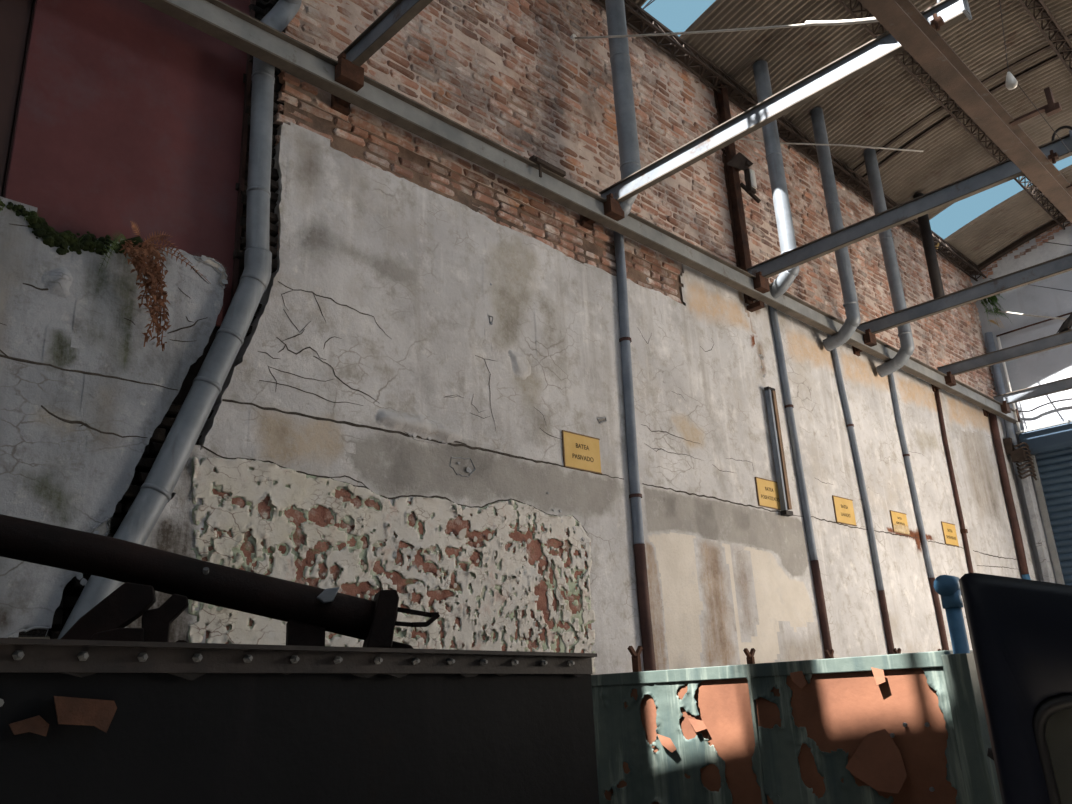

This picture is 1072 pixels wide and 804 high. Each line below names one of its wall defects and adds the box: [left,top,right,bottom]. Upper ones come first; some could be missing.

crack [41,405,148,438]
water stain [248,226,627,525]
crack [202,281,1020,570]
water stain [668,409,708,455]
water stain [680,273,769,384]
peeling [188,457,596,673]
water stain [642,485,826,670]
rust [886,525,934,555]
peeling [592,680,733,804]
peeling [747,676,907,804]
peeling [871,667,886,685]
peeling [921,667,968,804]